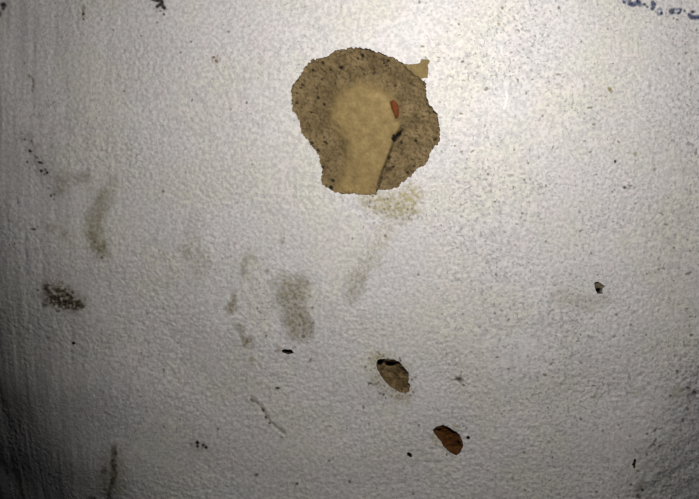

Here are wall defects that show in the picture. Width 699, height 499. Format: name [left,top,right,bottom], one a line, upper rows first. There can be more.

spalling [291,47,440,196]
damp [44,284,84,311]
spalling [376,359,410,393]
spalling [433,425,470,455]